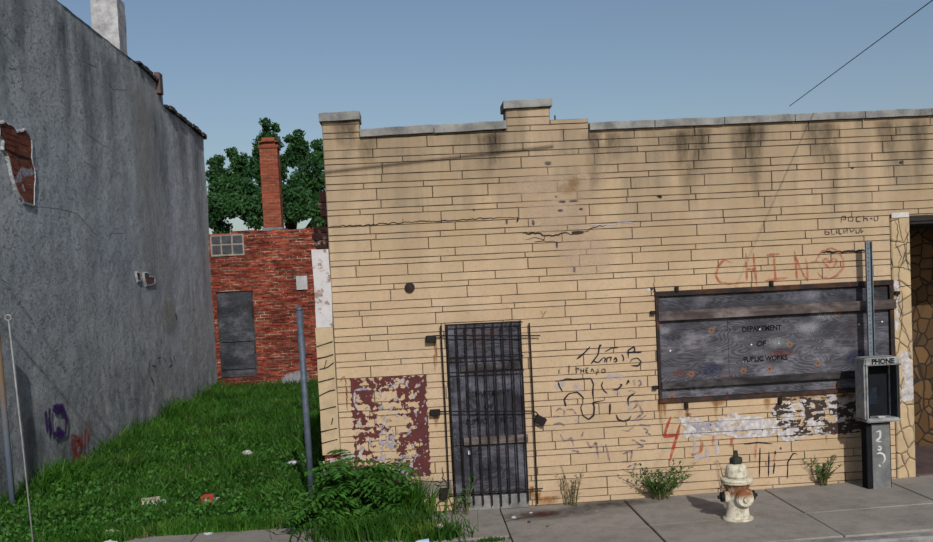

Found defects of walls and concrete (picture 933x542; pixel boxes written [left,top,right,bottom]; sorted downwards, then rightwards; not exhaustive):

spalling [0,120,36,208]
crack [330,217,635,242]
peeling [323,374,452,498]
peeling [678,393,861,441]